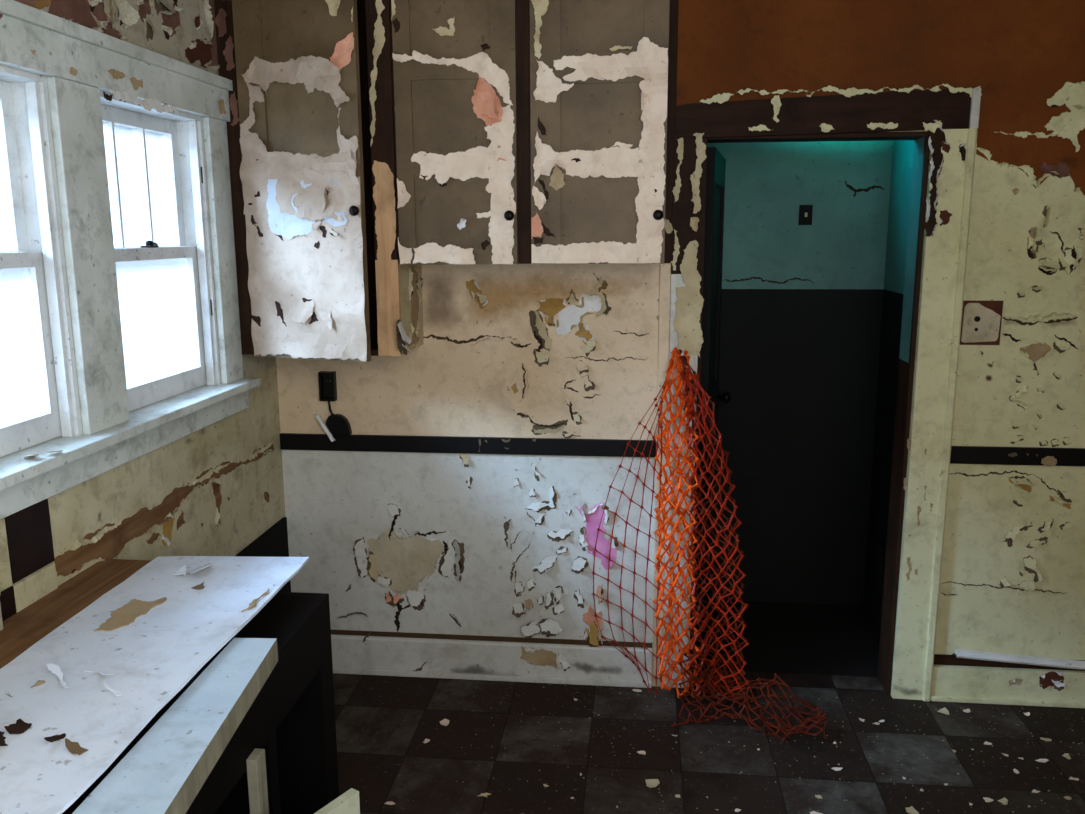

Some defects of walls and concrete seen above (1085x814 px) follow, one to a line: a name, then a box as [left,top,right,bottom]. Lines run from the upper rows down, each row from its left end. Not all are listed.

peeling [14,0,183,43]
peeling [676,0,1085,237]
crack [845,181,885,197]
crack [424,334,531,402]
peeling [513,273,611,442]
crack [565,331,649,361]
crack [1002,312,1079,353]
peeling [54,441,276,577]
peeling [353,504,465,611]
peeling [576,502,619,570]
crack [942,581,1065,596]
crack [949,470,1076,509]